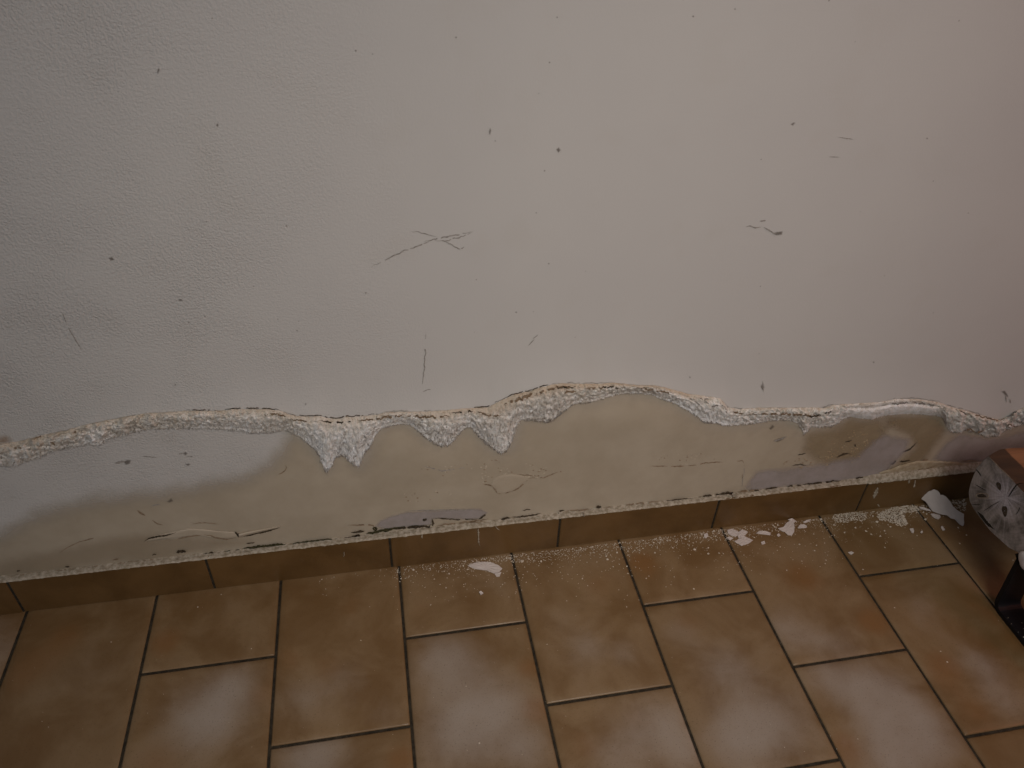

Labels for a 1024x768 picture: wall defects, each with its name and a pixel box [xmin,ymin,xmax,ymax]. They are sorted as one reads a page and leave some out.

crack [375,231,473,265]
flaking render [0,382,1024,474]
damp [0,393,1024,576]
peeling [144,522,280,542]
peeling [351,509,486,533]
peeling [726,529,765,546]
peeling [919,489,964,530]
peeling [468,562,502,577]